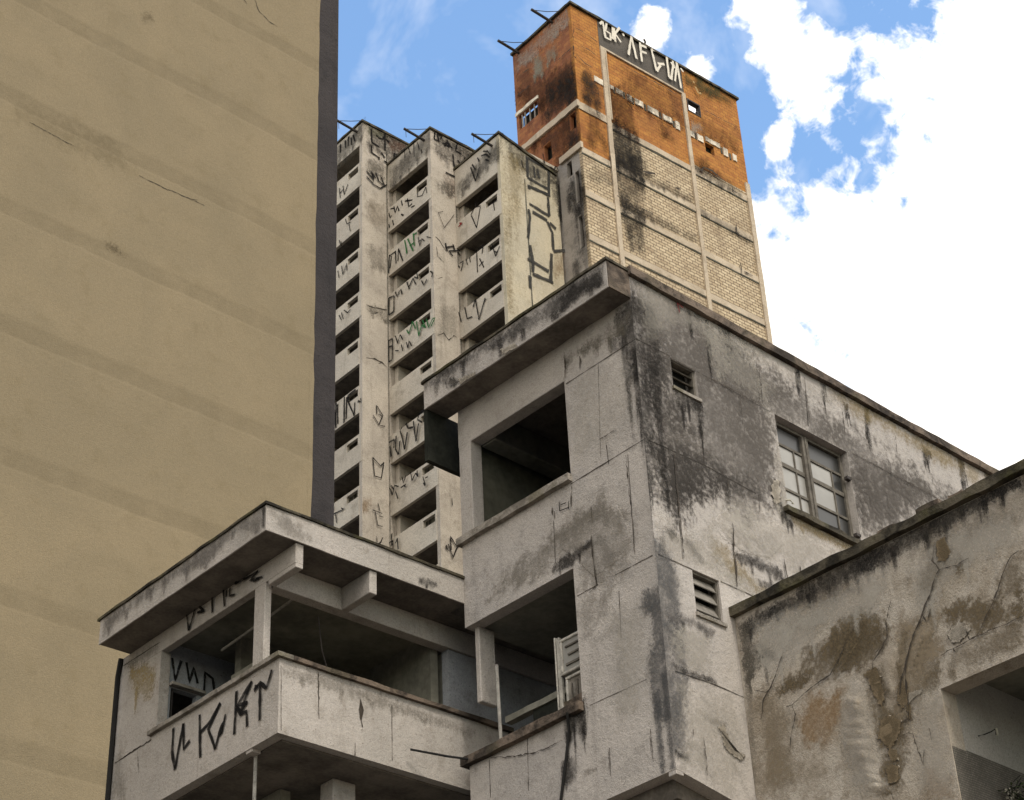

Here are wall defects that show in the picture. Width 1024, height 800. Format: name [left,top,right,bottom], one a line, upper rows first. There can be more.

leakage [529,91,600,120]
leakage [613,120,646,193]
leakage [610,157,645,251]
leakage [677,396,704,450]
leakage [554,513,591,575]
leakage [692,504,783,594]
leakage [640,530,717,773]
crack [755,627,854,752]
leakage [738,477,1024,796]
crack [872,541,968,765]
crack [942,551,1023,655]